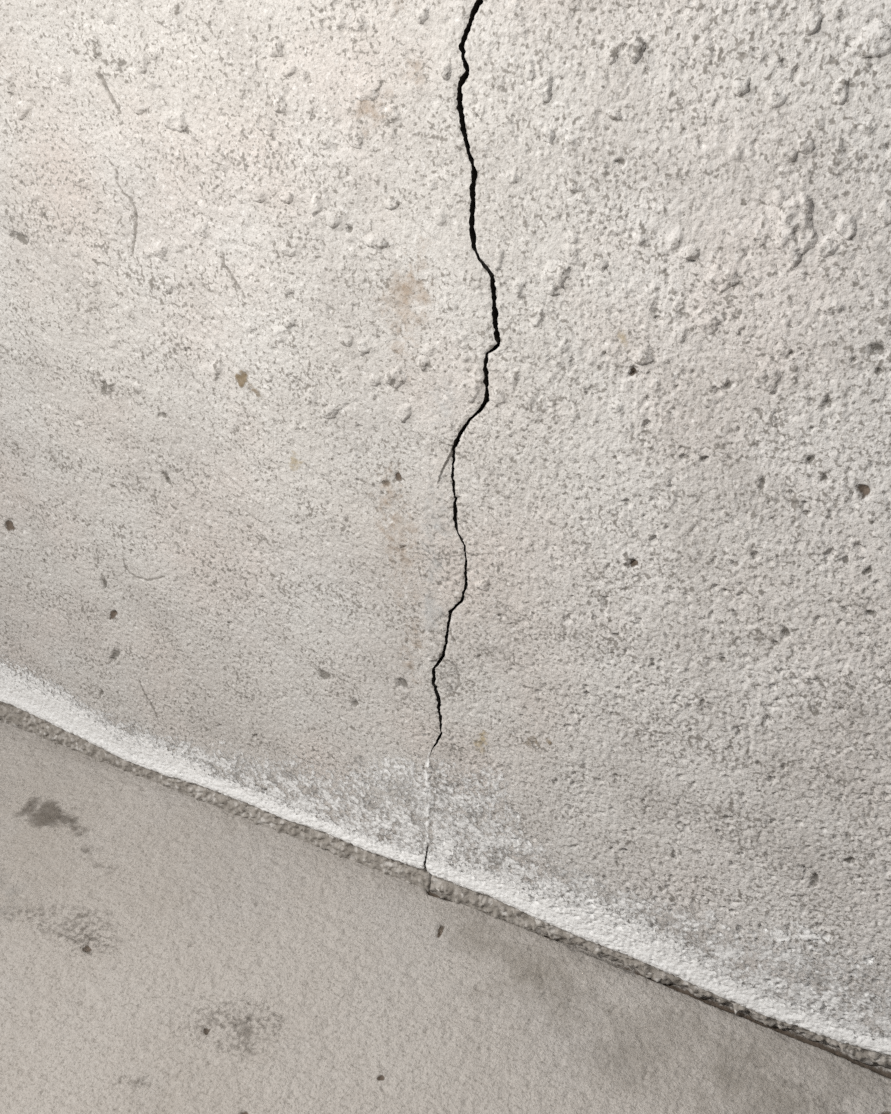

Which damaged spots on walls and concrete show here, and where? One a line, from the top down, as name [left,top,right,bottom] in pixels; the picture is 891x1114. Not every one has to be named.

crack [429,0,501,760]
crack [424,843,449,901]